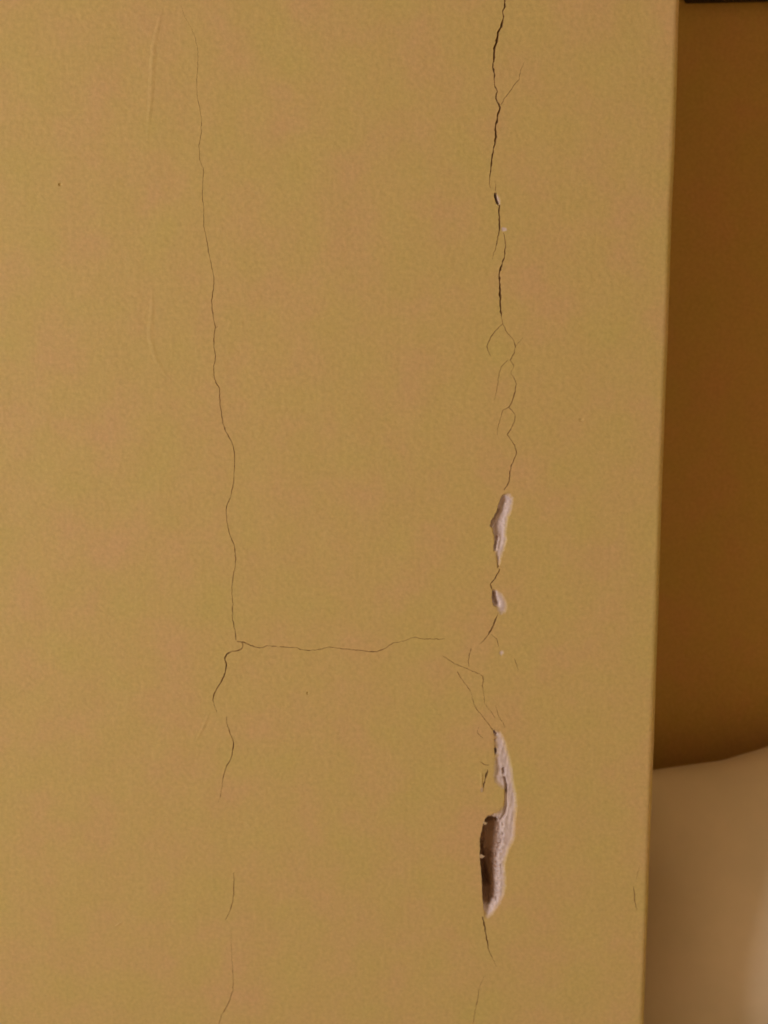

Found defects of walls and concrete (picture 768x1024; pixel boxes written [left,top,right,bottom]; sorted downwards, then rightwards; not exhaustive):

crack [182,0,523,796]
flaking render [490,492,514,569]
flaking render [491,588,508,616]
flaking render [479,730,518,919]
crack [473,917,495,1023]